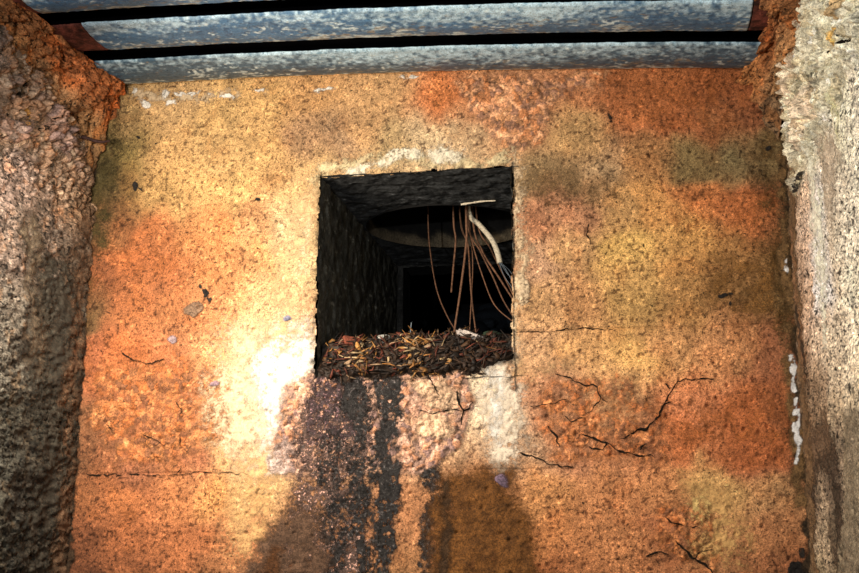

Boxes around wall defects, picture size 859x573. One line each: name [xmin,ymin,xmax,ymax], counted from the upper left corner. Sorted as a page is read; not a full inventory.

damp [90,118,122,248]
damp [800,89,842,343]
damp [13,213,94,573]
crack [87,402,248,476]
damp [199,146,615,573]
crack [520,373,713,468]
damp [706,132,859,573]
crack [646,517,732,573]
damp [679,469,754,566]